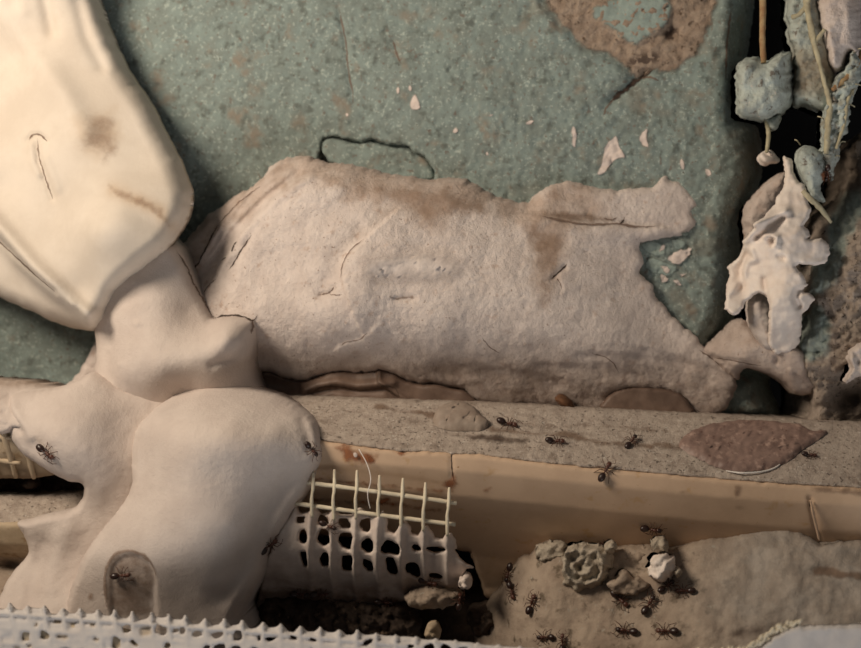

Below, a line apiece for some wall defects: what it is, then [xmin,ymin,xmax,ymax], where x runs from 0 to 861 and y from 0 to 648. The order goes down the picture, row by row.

spalling [547,0,716,78]
crack [29,133,52,196]
peeling [322,137,434,180]
peeling [793,145,825,203]
crack [0,242,55,292]
crack [179,187,259,334]
crack [321,240,362,296]
peeling [642,232,692,285]
flaking render [404,585,463,610]